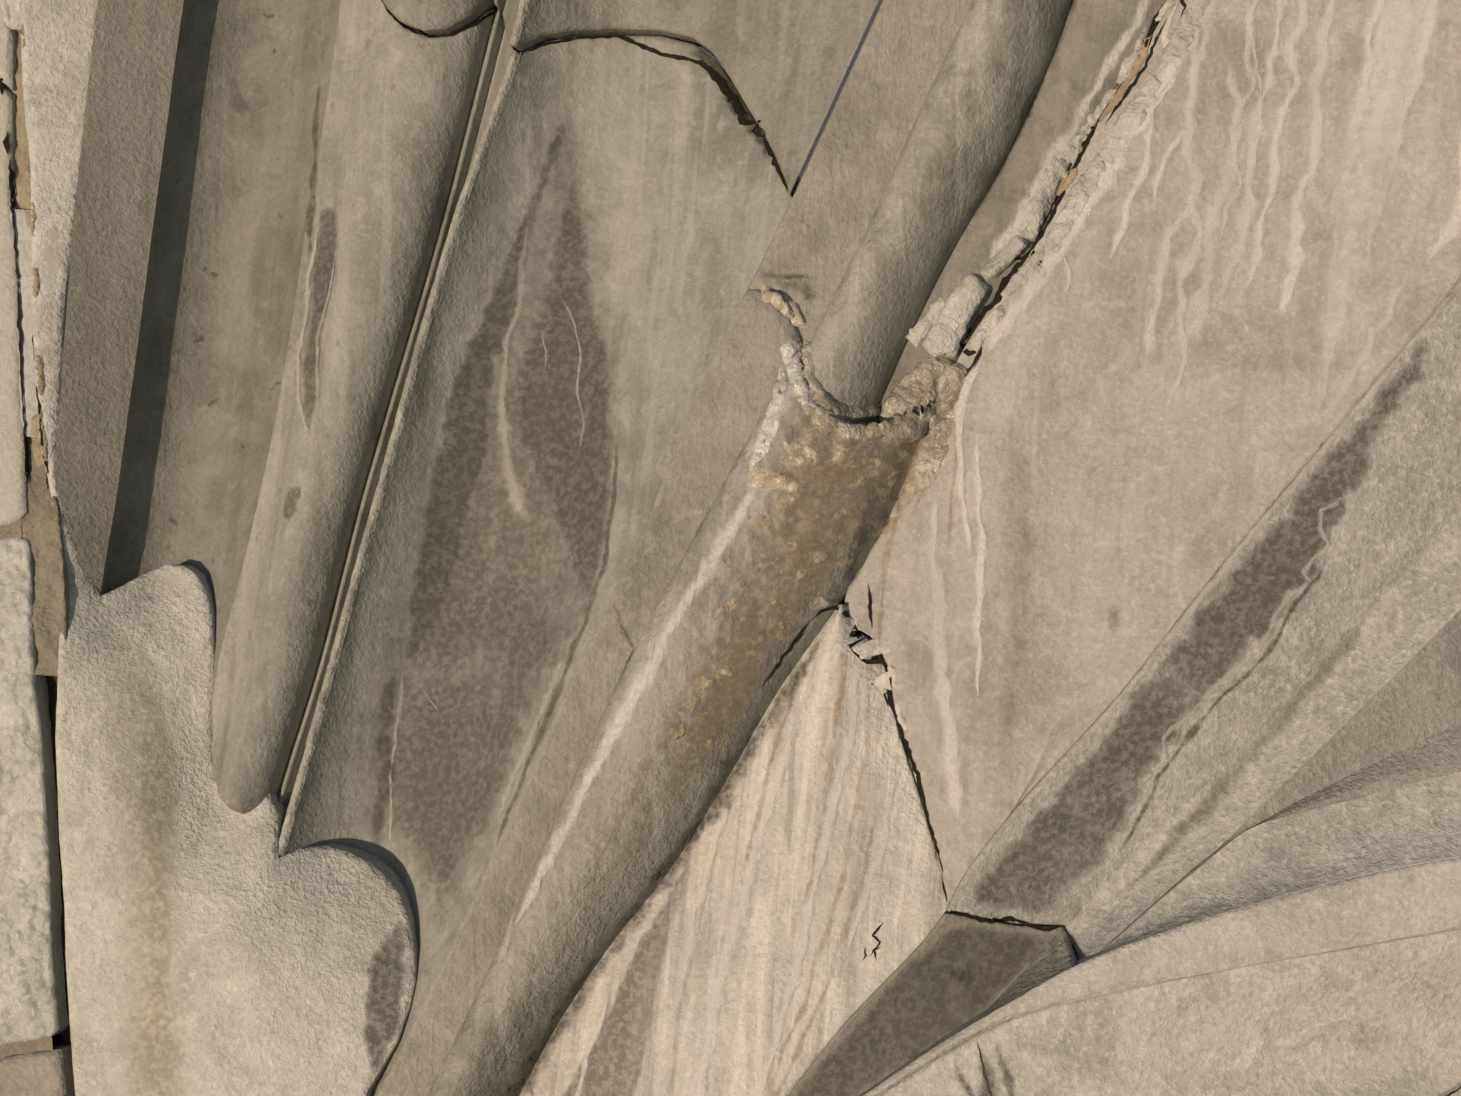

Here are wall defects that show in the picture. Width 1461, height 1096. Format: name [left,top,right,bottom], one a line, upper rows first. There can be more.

crack [381,0,496,38]
crack [516,34,787,191]
peeling [905,0,1212,358]
leakage [412,223,617,746]
leakage [500,0,1335,958]
leakage [978,0,1442,905]
leakage [372,684,491,862]
leakage [566,657,814,1096]
leakage [764,674,860,1084]
crack [761,586,1069,953]
leakage [801,930,1039,1096]